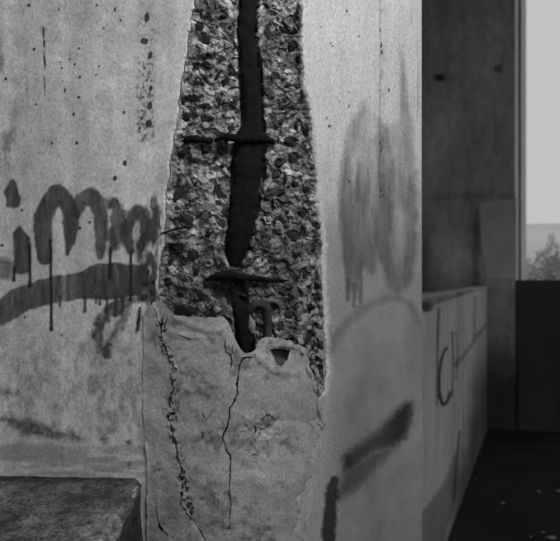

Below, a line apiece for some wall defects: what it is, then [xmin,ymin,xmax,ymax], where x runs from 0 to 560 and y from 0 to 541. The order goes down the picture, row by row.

spalling [132,0,330,398]
crack [154,308,206,541]
crack [220,337,252,529]